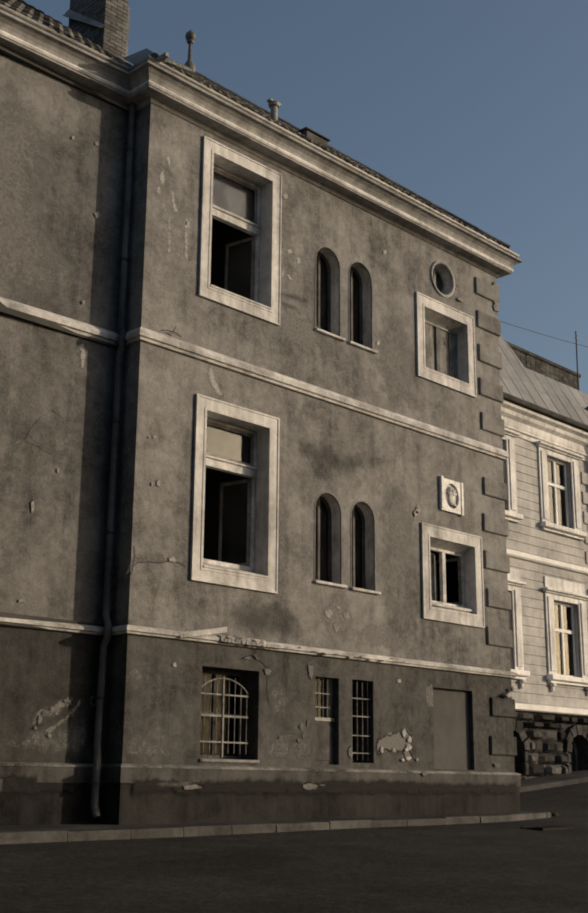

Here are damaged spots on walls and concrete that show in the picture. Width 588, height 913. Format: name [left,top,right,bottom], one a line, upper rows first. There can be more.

crack [131,548,186,574]
spalling [219,634,301,649]
peeling [12,697,88,752]
spalling [375,726,418,763]